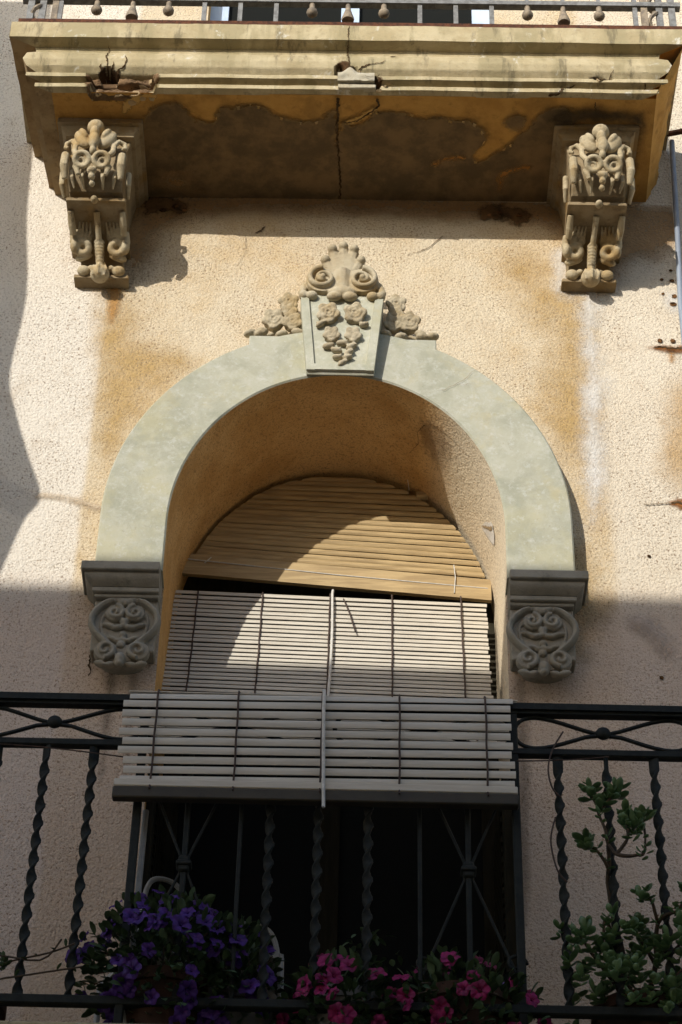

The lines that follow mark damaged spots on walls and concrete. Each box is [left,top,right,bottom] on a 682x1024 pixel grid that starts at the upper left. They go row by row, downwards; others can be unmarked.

peeling [85,47,574,226]
crack [335,26,395,200]
damp [125,197,562,271]
damp [610,206,675,273]
corrosion [109,288,120,318]